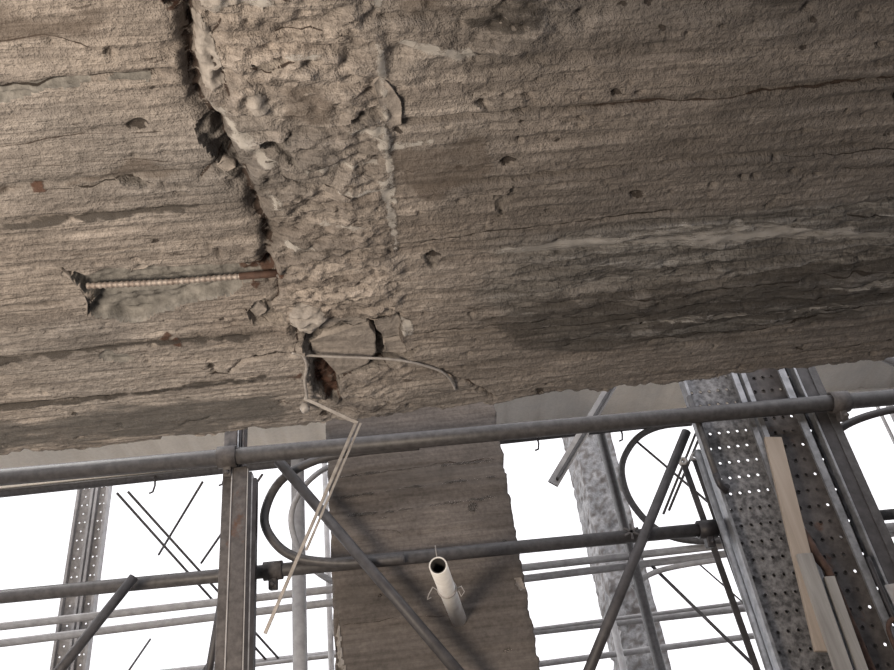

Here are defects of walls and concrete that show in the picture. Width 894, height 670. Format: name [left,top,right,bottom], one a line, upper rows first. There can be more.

crack [0,76,65,86]
spalling [194,110,240,177]
crack [181,0,298,264]
spalling [346,76,402,134]
crack [570,76,894,107]
water stain [306,112,434,249]
water stain [498,219,894,254]
spalling [36,255,278,323]
crack [210,323,307,374]
rust [314,357,340,399]
spalling [302,312,420,415]
water stain [401,317,413,337]